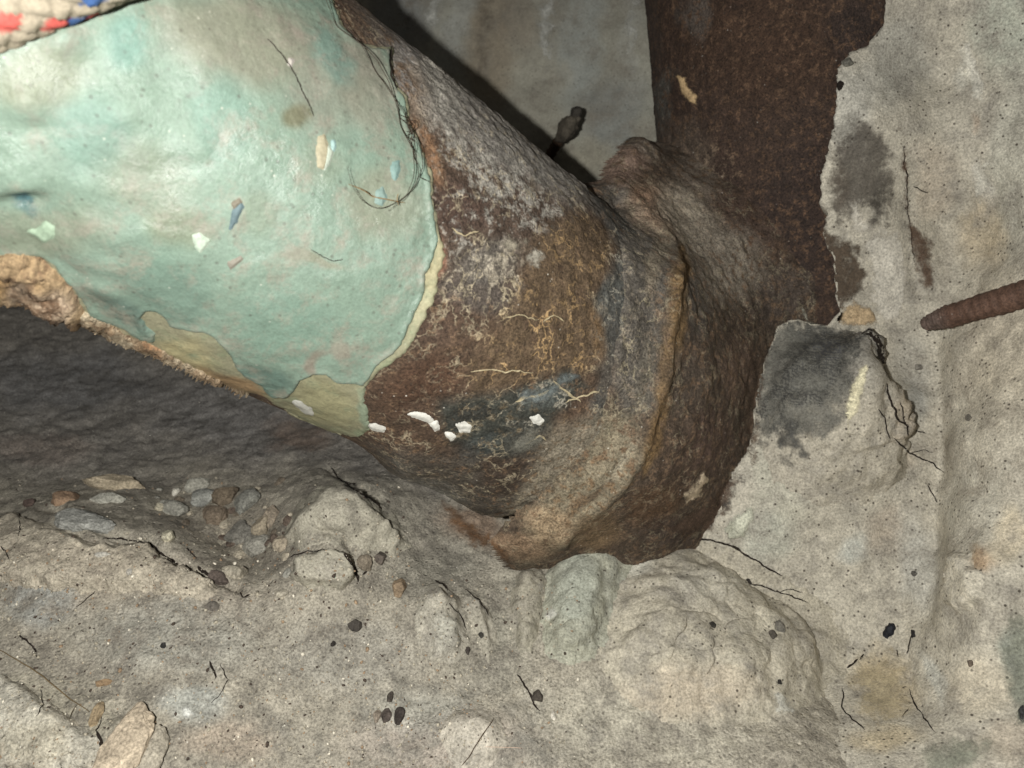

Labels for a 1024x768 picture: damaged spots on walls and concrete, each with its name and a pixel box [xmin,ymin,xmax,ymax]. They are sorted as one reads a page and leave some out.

peeling [316,134,337,170]
damp [828,121,905,320]
corrosion [824,231,866,309]
peeling [368,423,386,433]
peeling [407,412,472,441]
damp [773,413,809,461]
efflorescence [846,366,868,419]
crack [861,329,944,503]
crack [103,537,209,576]
corrosion [445,508,508,561]
corrosion [649,480,738,538]
crack [701,538,808,603]